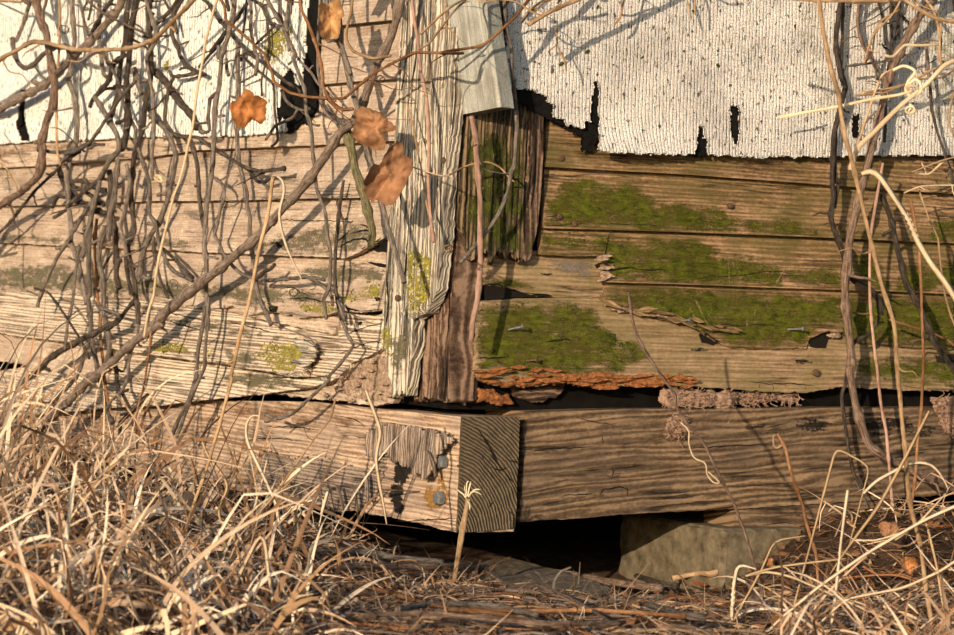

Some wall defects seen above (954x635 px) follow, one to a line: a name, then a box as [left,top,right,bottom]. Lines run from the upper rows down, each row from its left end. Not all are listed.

peeling [470,365,700,390]
peeling [259,422,456,513]